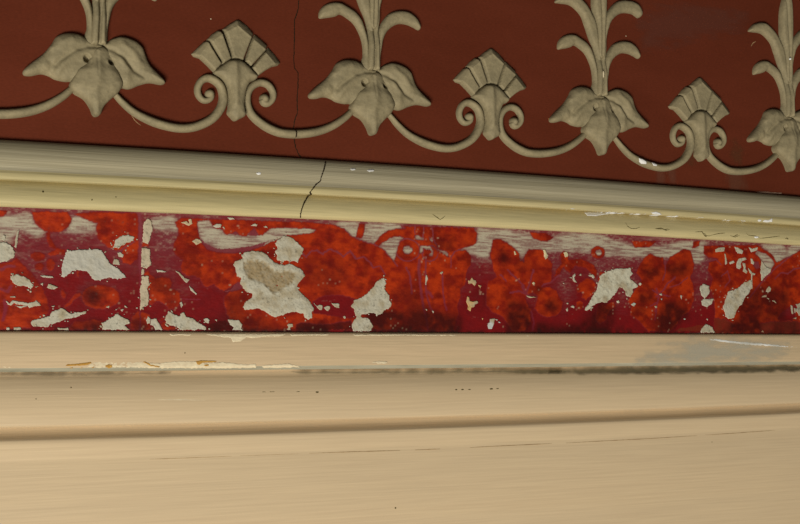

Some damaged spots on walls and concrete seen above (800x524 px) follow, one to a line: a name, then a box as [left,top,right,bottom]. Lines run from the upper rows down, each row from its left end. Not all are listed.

crack [293,1,301,157]
crack [300,161,326,218]
peeling [0,230,19,263]
spalling [6,219,455,342]
spalling [563,267,641,311]
peeling [700,284,714,307]
spalling [715,236,776,321]
peeling [87,361,299,369]